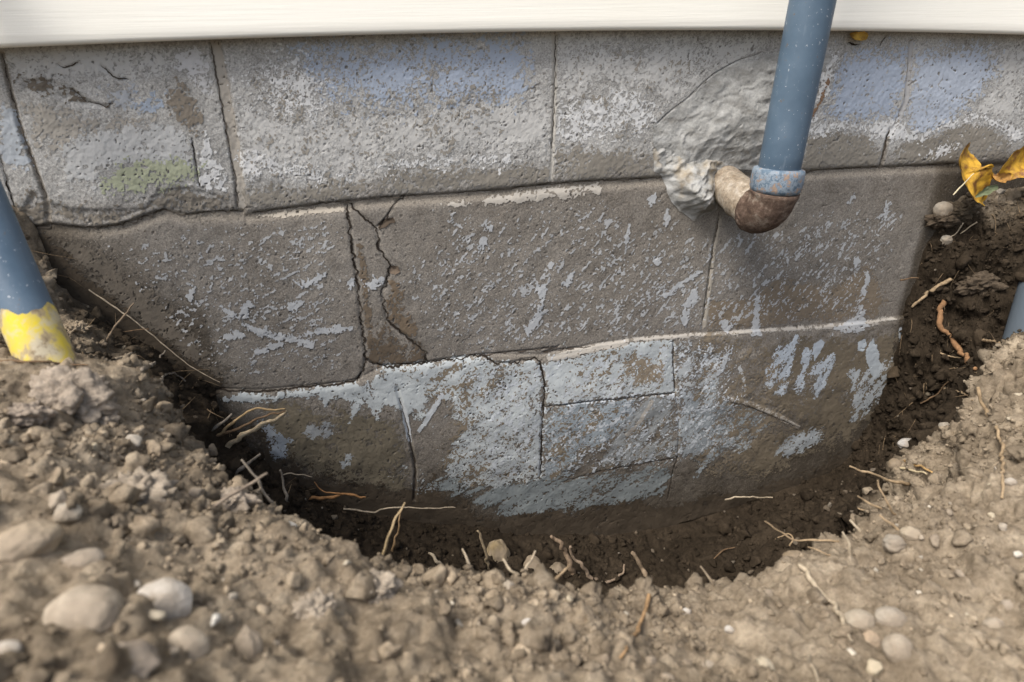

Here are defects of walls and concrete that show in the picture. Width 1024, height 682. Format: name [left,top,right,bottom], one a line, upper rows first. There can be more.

crack [36,36,677,497]
peeling [0,30,902,517]